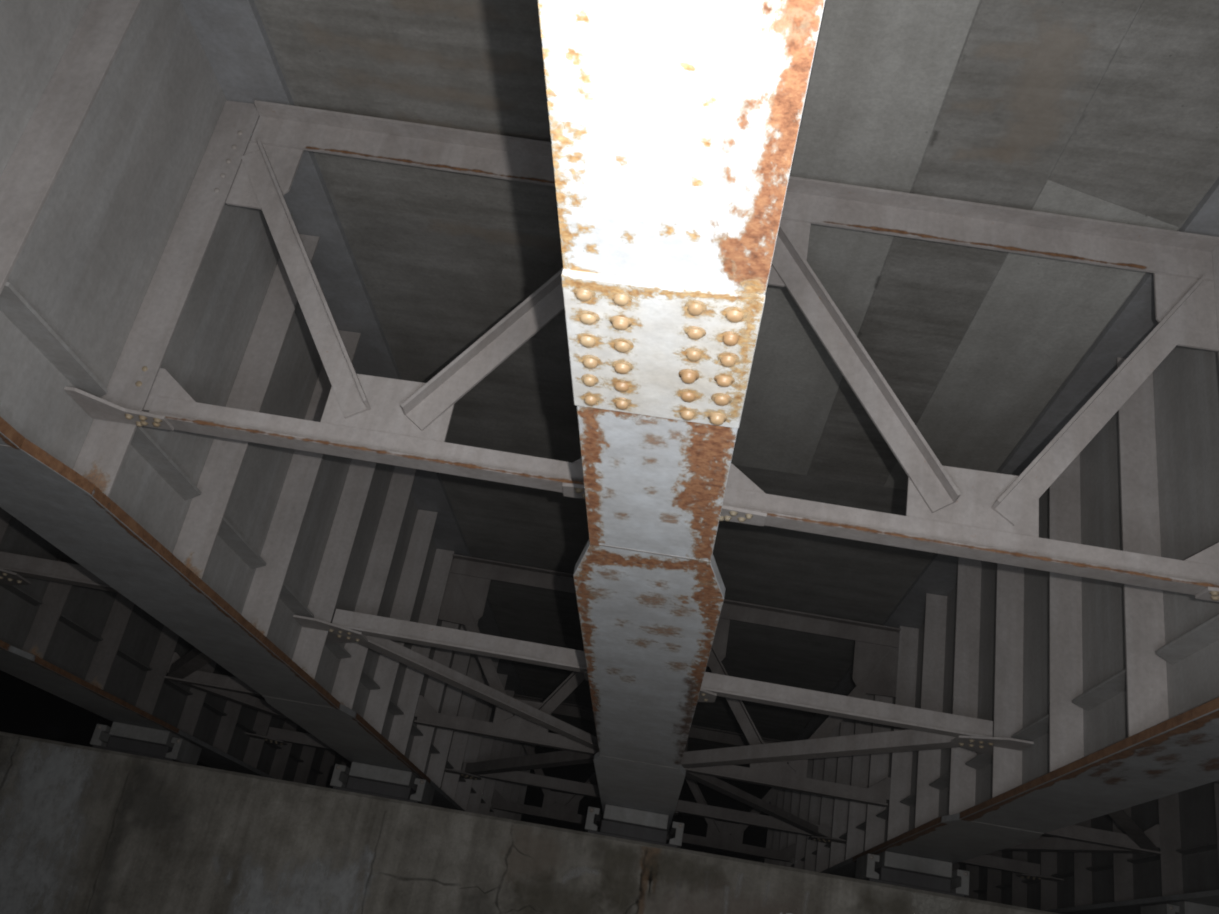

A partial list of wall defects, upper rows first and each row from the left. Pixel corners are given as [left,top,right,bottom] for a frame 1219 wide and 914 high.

rust [166,0,824,764]
rust [852,697,1219,862]